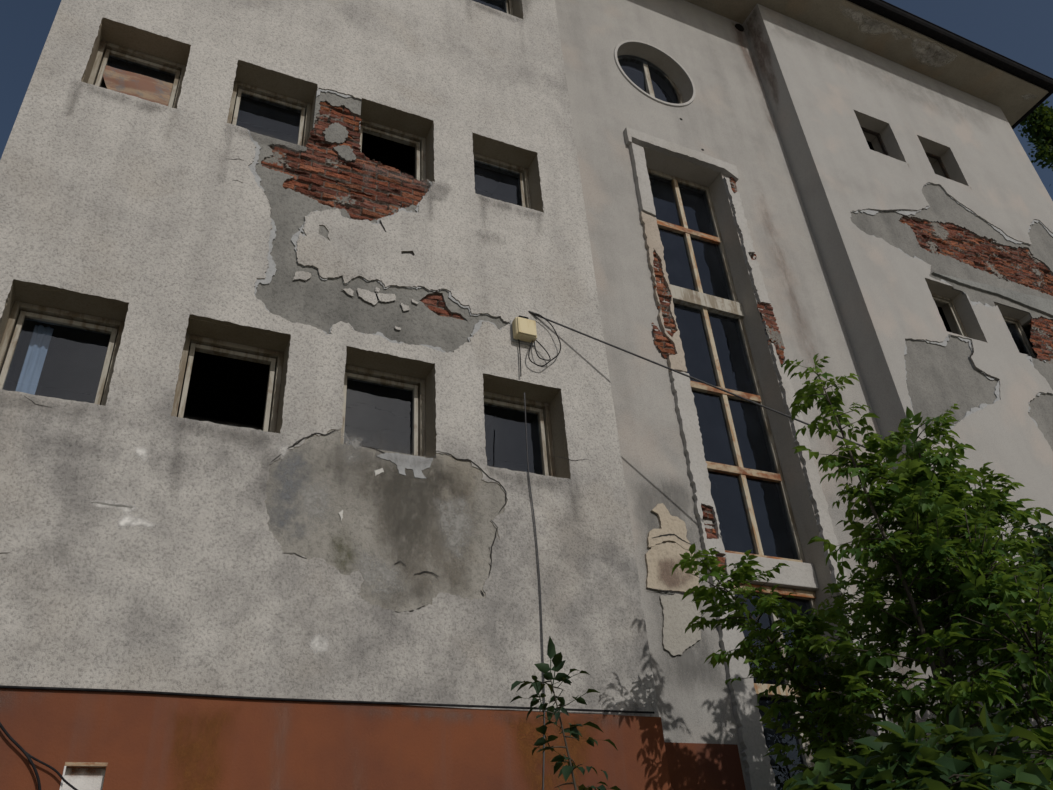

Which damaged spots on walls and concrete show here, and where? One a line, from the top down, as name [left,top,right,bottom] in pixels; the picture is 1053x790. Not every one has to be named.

flaking render [248,88,509,353]
flaking render [651,252,676,359]
flaking render [757,302,785,365]
flaking render [850,183,1053,451]
flaking render [265,429,508,613]
flaking render [701,505,718,539]